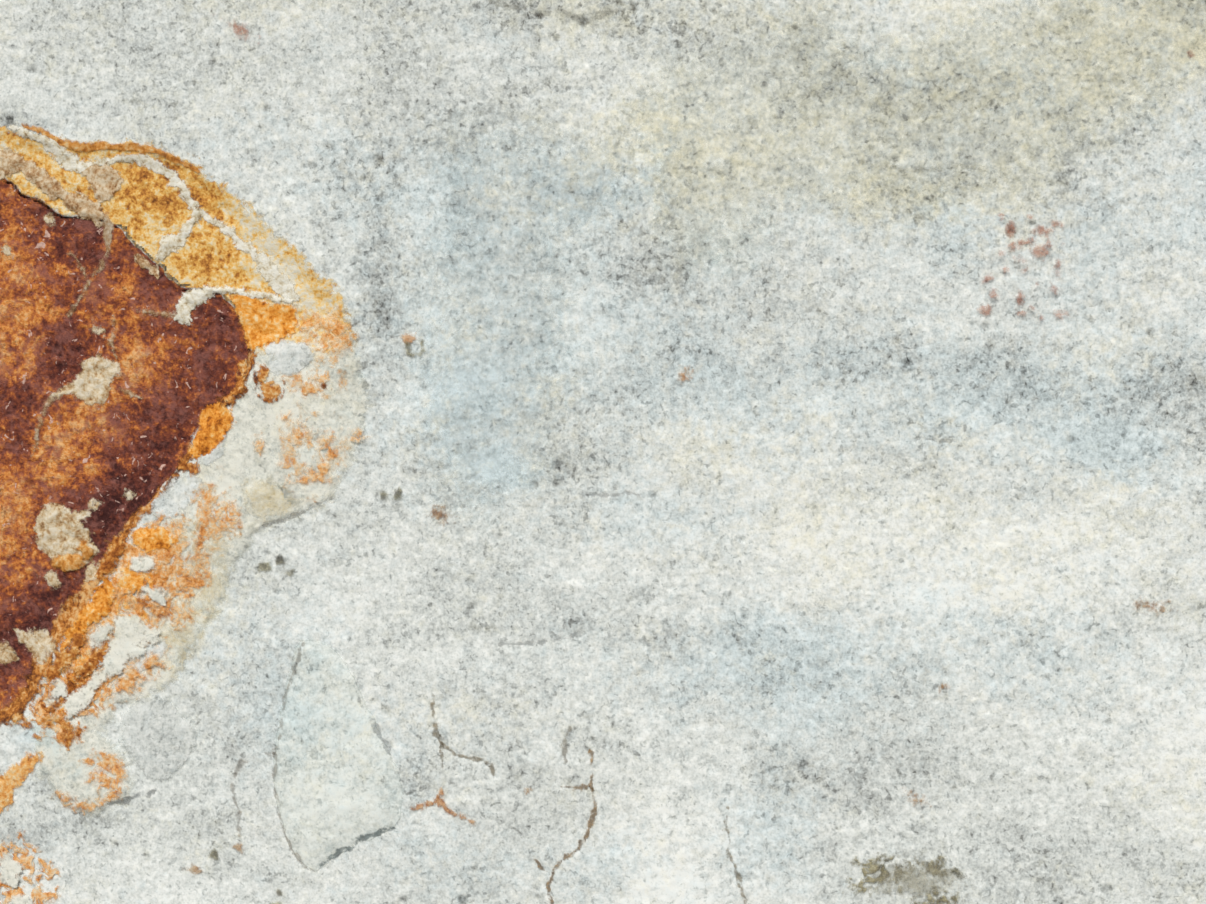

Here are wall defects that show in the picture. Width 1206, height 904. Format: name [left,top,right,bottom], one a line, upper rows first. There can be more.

spalling [0,124,369,816]
corrosion [0,294,364,815]
peeling [0,853,35,904]
corrosion [0,833,59,904]
crack [535,749,597,904]